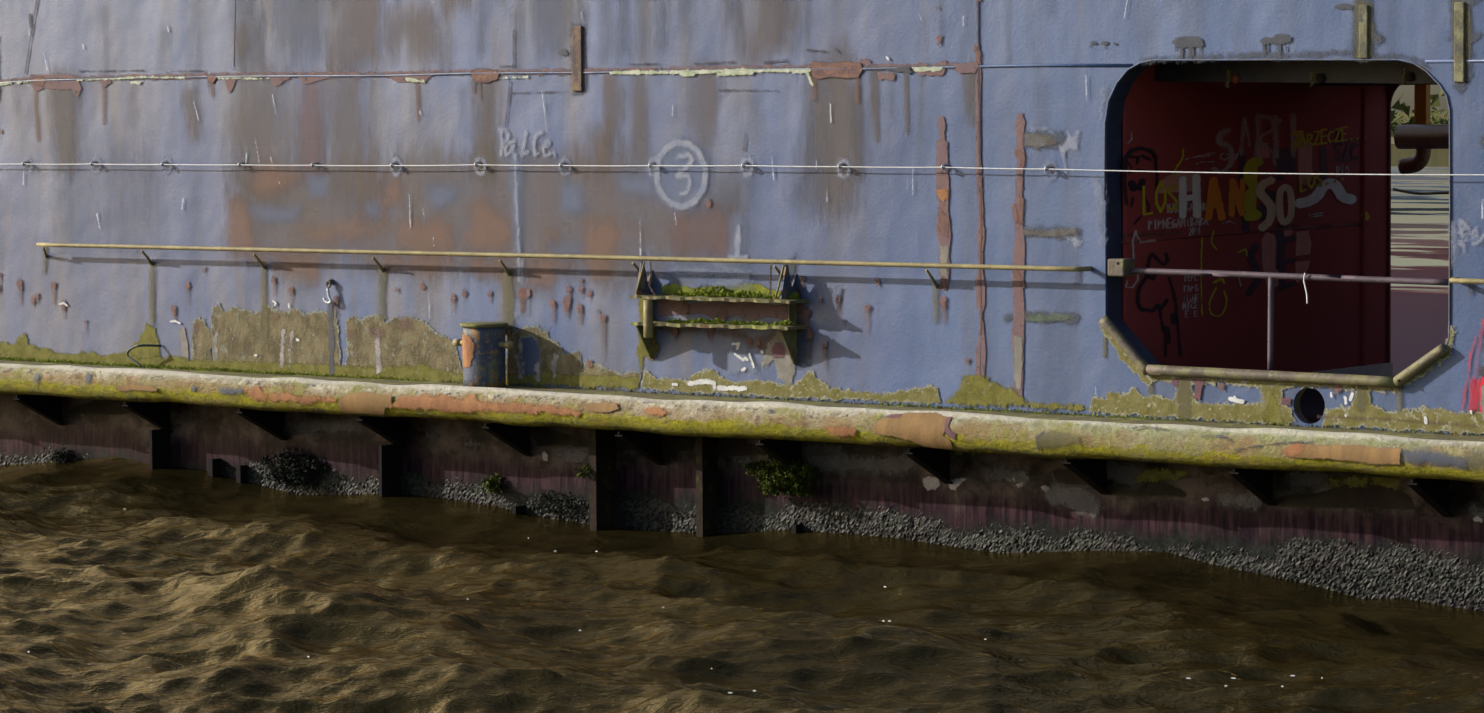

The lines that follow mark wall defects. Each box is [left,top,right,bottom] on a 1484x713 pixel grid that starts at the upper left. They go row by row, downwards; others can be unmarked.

corrosion [0,24,986,384]
corrosion [1012,113,1025,398]
peeling [170,300,463,376]
peeling [505,288,642,383]
corrosion [244,385,581,418]
peeling [585,401,619,413]